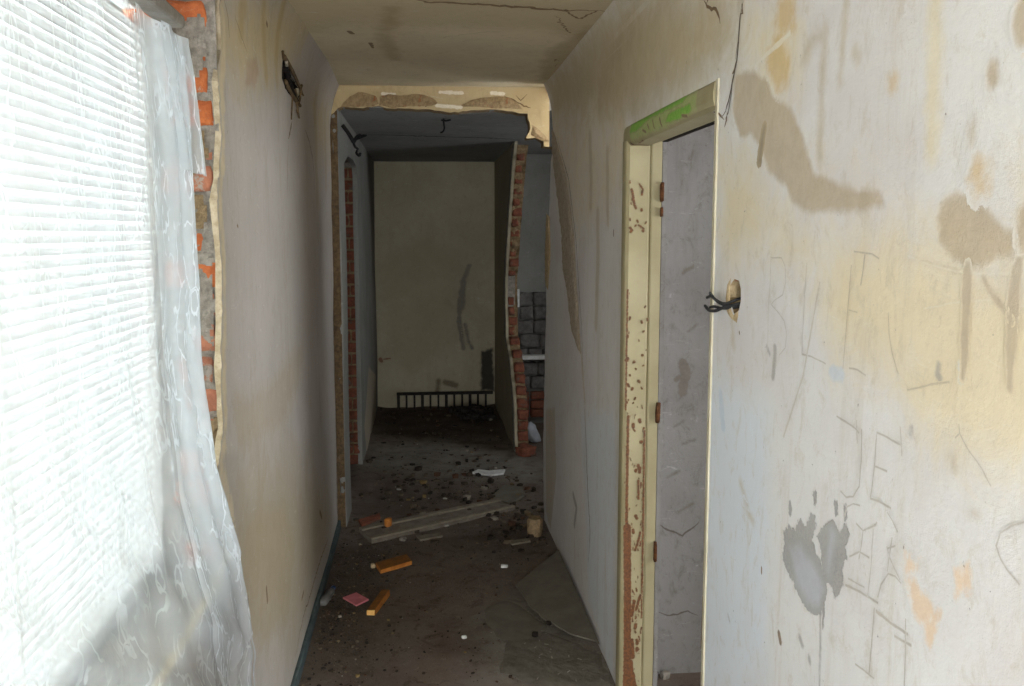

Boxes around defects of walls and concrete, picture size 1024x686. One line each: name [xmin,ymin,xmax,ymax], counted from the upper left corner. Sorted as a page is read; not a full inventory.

crack [418,0,605,41]
water stain [731,67,887,217]
flaking render [111,0,237,567]
flaking render [330,90,522,527]
water stain [934,187,1024,396]
rust [622,289,649,686]
spalling [782,489,850,686]